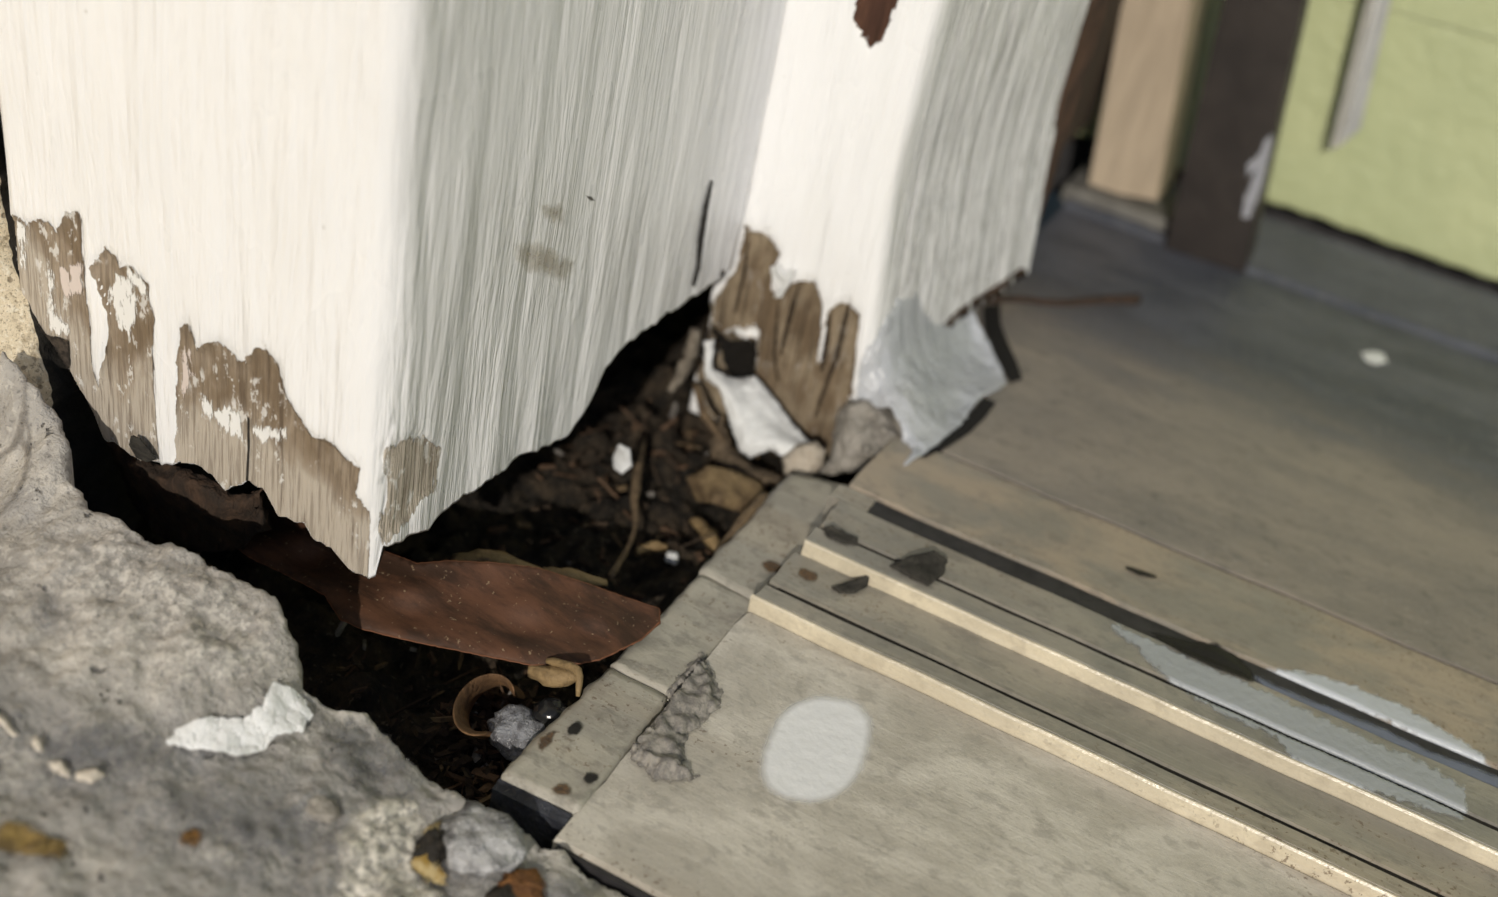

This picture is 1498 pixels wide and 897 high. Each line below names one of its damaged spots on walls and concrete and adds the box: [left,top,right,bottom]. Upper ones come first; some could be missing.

peeling [853,0,898,49]
peeling [12,211,441,578]
peeling [696,224,860,462]